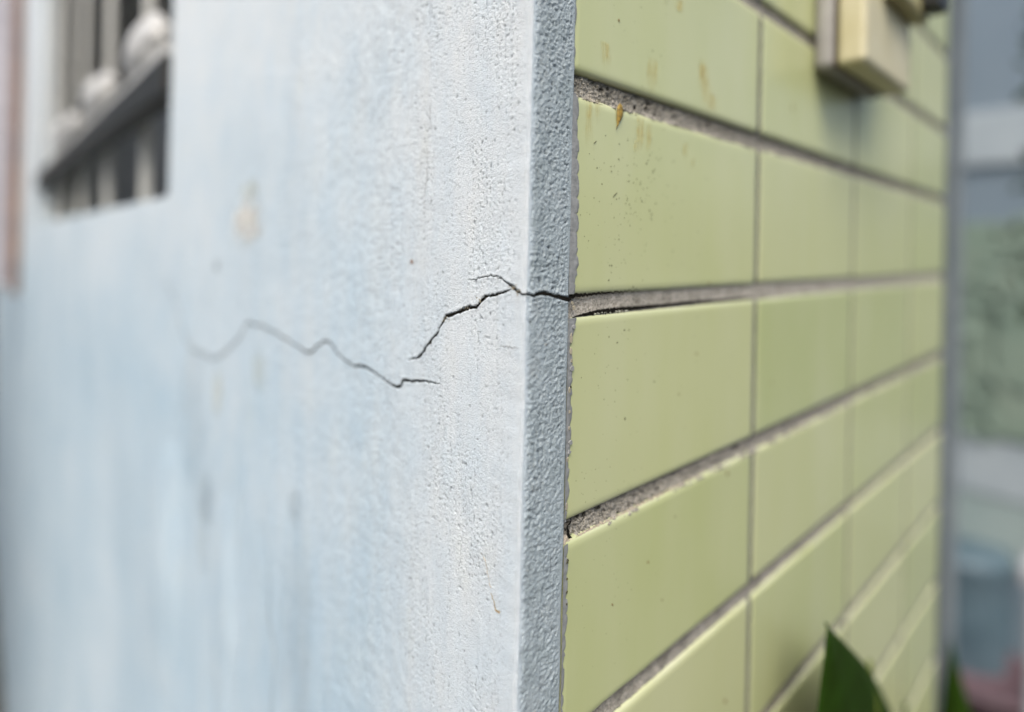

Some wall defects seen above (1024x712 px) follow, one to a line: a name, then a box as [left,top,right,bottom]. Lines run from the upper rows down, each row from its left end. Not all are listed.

crack [162,274,755,389]